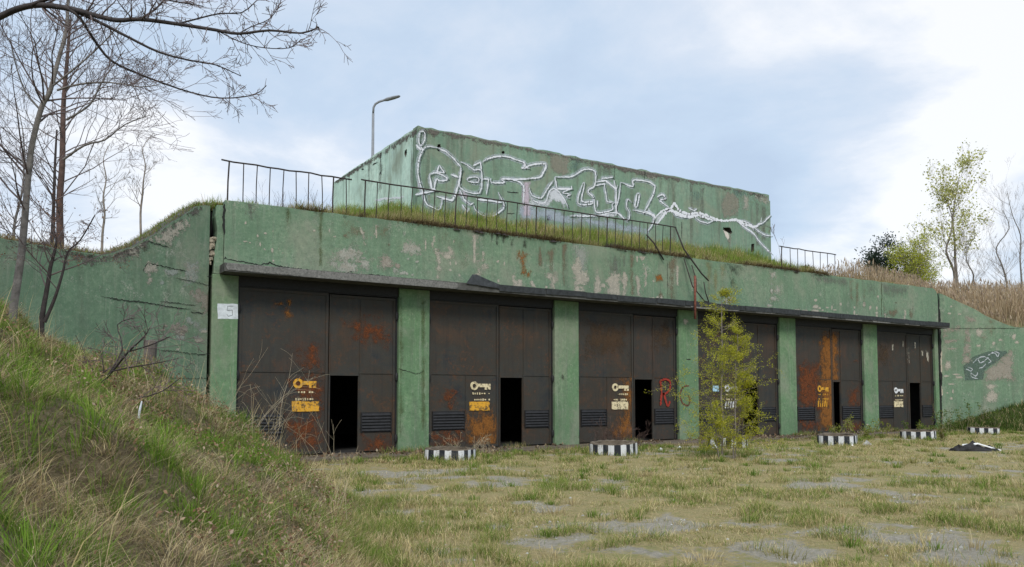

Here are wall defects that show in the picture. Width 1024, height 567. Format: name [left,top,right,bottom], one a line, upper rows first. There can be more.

crack [102,204,309,314]
peeling [568,256,663,298]
rust [284,343,325,450]
rust [431,412,496,446]
rust [796,331,839,431]